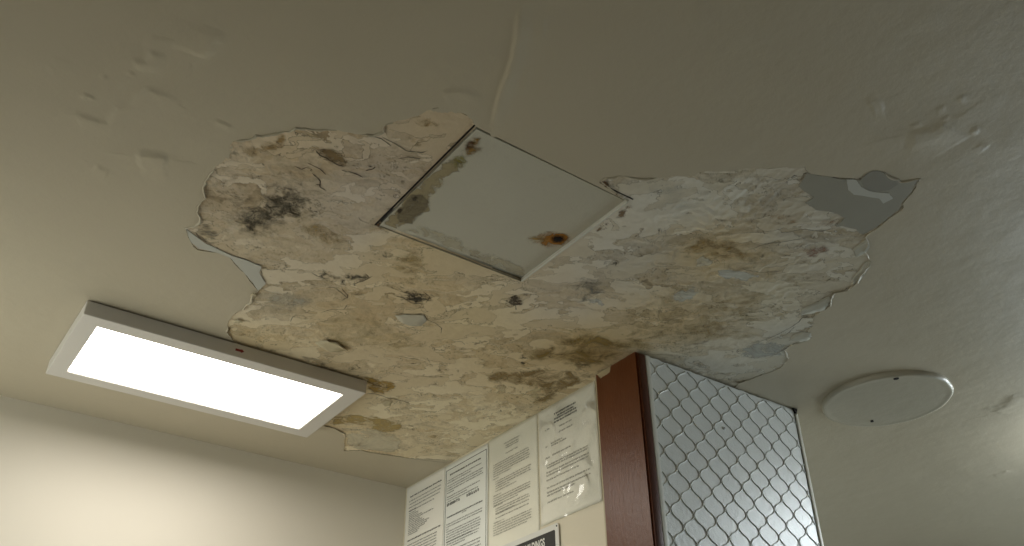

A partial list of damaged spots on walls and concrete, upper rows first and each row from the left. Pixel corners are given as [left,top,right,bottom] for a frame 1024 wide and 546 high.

water stain [244,188,304,230]
rust [530,233,568,246]
peeling [185,108,921,461]
water stain [489,336,622,402]